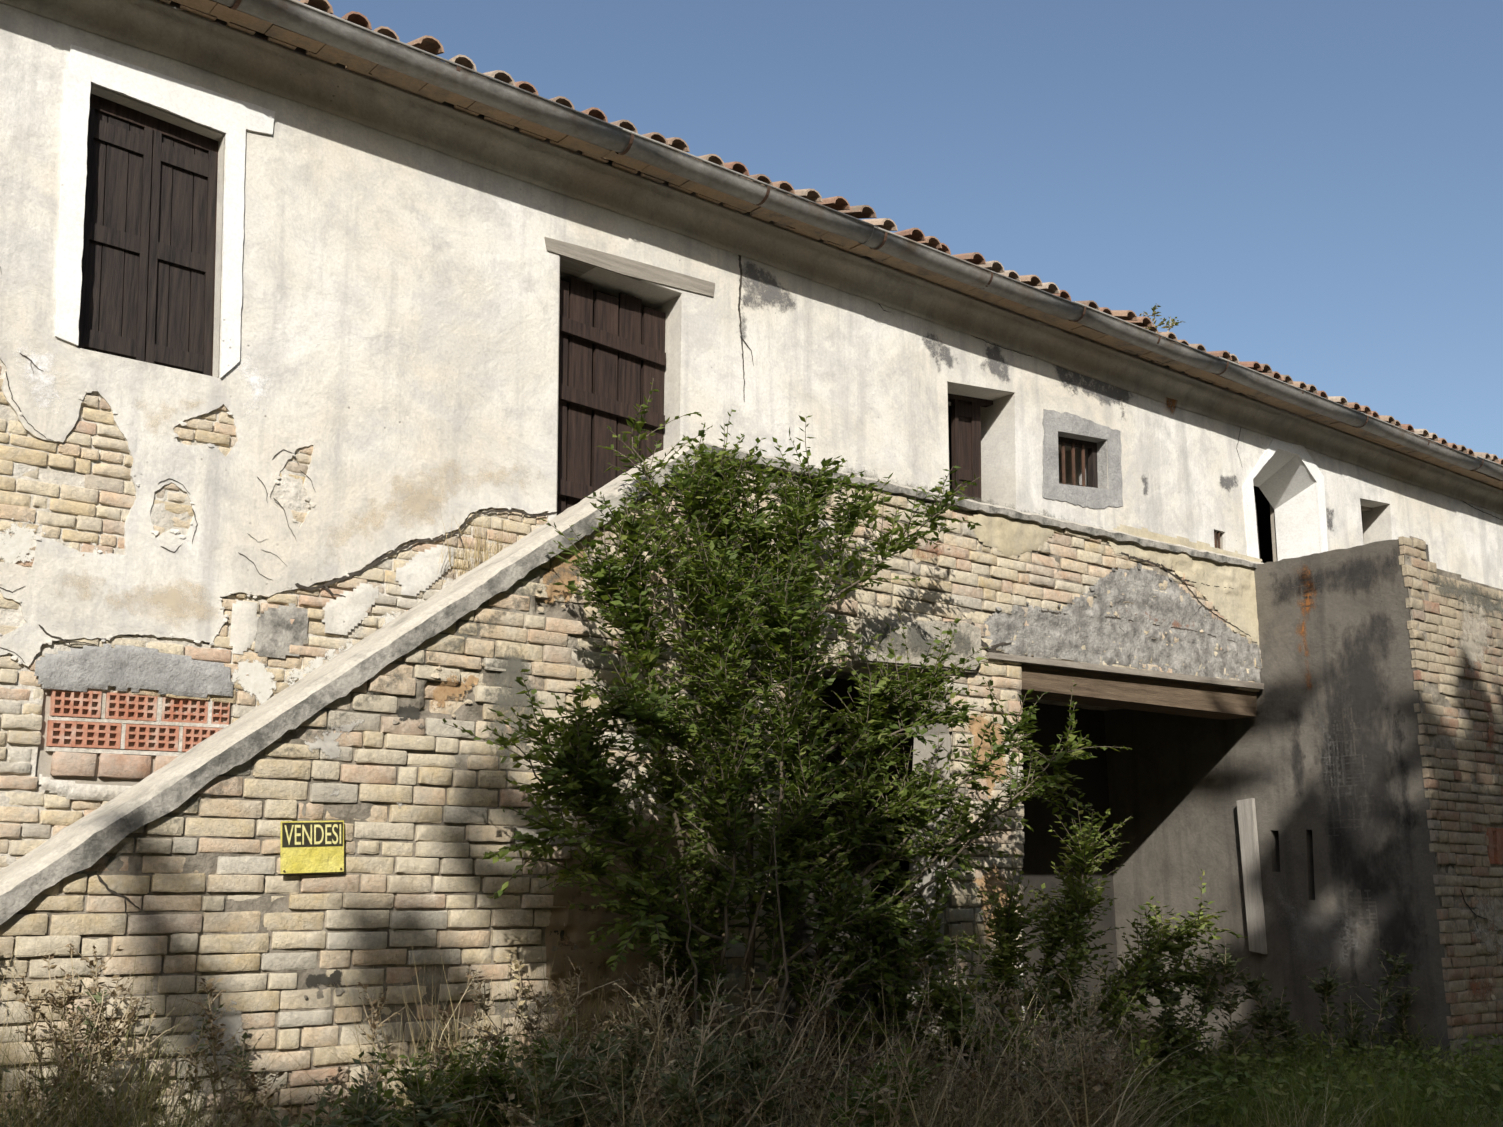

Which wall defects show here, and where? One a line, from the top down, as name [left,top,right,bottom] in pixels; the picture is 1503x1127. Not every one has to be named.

crack [738,255,754,402]
leakage [741,262,795,339]
leakage [922,334,952,367]
leakage [983,346,1009,381]
leakage [1056,366,1133,416]
flaking render [0,360,198,568]
flaking render [173,405,238,457]
flaking render [257,445,315,542]
leakage [1279,558,1390,600]
flaking render [0,584,26,664]
spalling [393,663,485,729]
leakage [1293,618,1417,983]